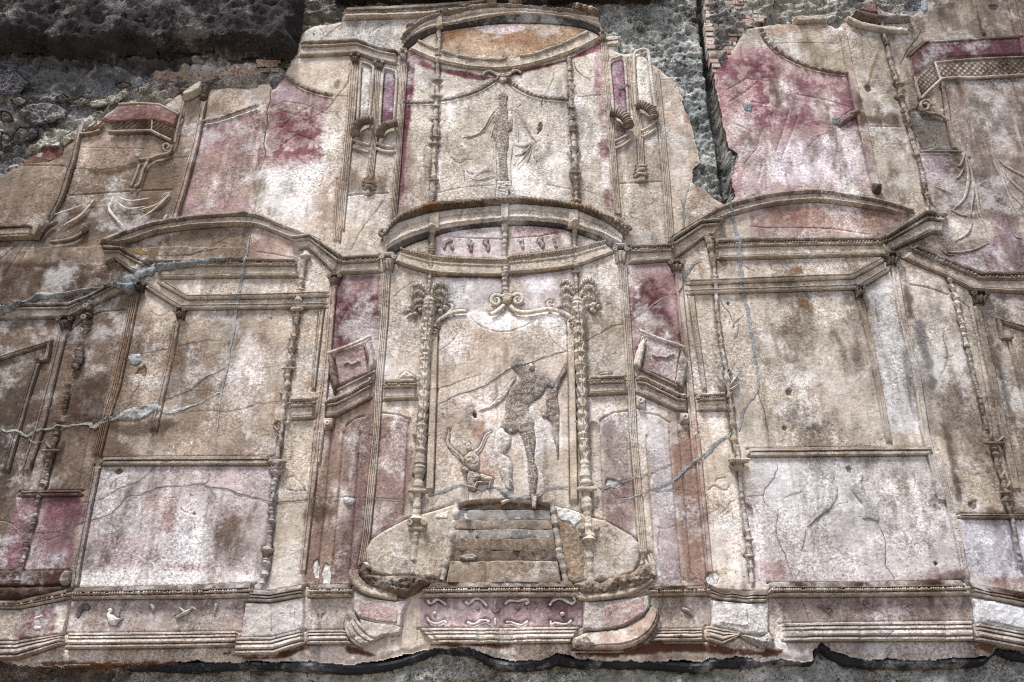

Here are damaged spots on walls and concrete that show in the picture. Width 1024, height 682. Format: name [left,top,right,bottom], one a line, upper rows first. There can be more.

spalling [23,145,63,164]
crack [0,215,280,443]
crack [599,202,768,499]
crack [1,467,403,541]
crack [428,484,571,501]
crack [723,465,799,573]